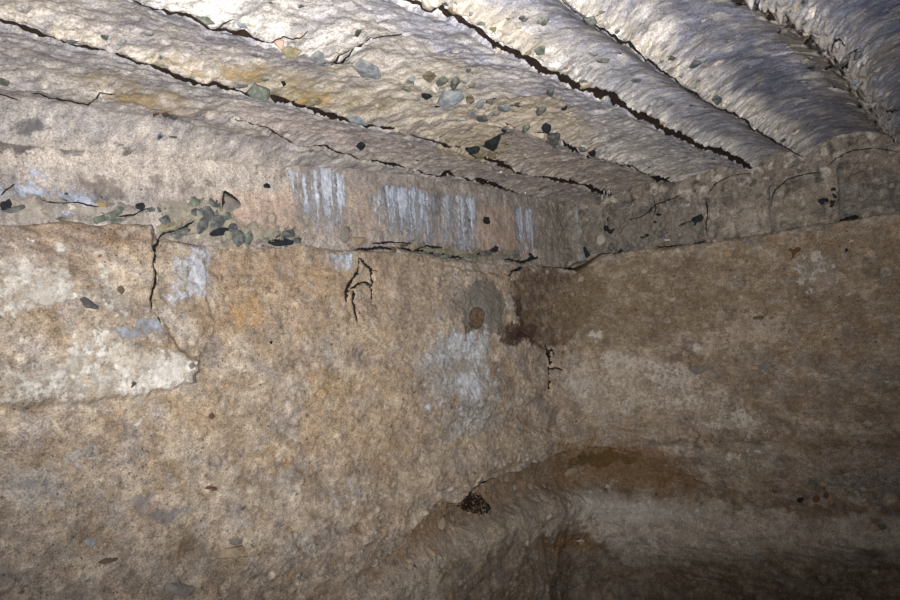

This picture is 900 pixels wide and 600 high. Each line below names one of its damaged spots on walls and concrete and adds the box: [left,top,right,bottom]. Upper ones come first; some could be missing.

crack [0,19,612,197]
crack [404,0,752,248]
crack [562,0,896,205]
crack [43,200,147,217]
efflorescence [285,167,352,237]
efflorescence [367,184,477,252]
efflorescence [513,206,536,254]
crack [839,214,859,222]
crack [150,221,194,322]
crack [344,241,538,322]
water stain [413,280,536,445]
crack [545,344,563,392]